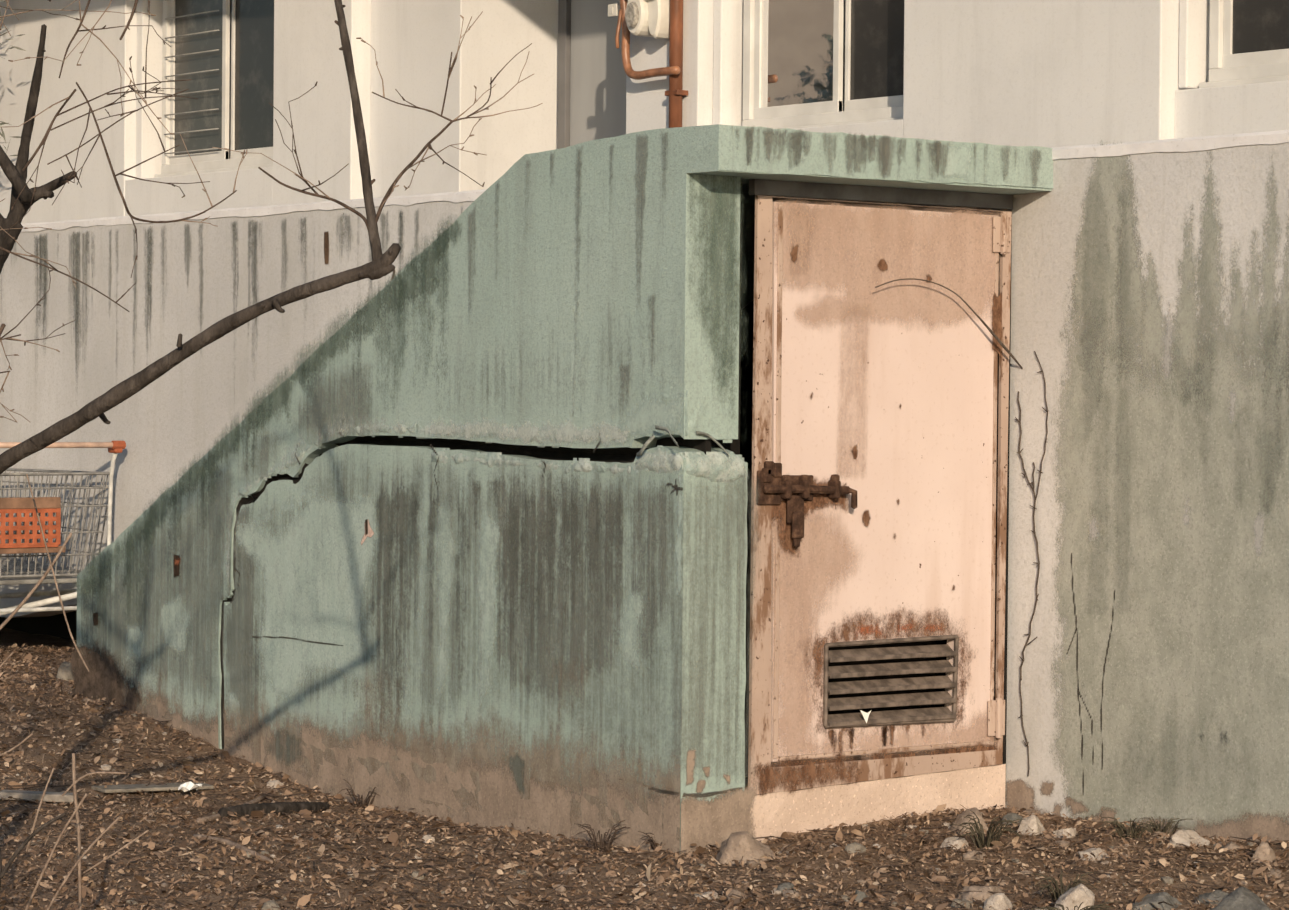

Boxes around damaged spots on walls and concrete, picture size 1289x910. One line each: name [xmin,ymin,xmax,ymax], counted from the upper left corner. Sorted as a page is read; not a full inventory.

leakage [37,236,47,301]
leakage [71,234,87,326]
leakage [636,136,647,219]
leakage [746,130,810,163]
leakage [829,136,892,176]
leakage [227,513,257,728]
leakage [78,215,475,616]
leakage [366,489,439,725]
crack [220,421,711,749]
leakage [457,481,621,688]
corrosion [755,479,997,795]
leakage [1051,144,1289,830]